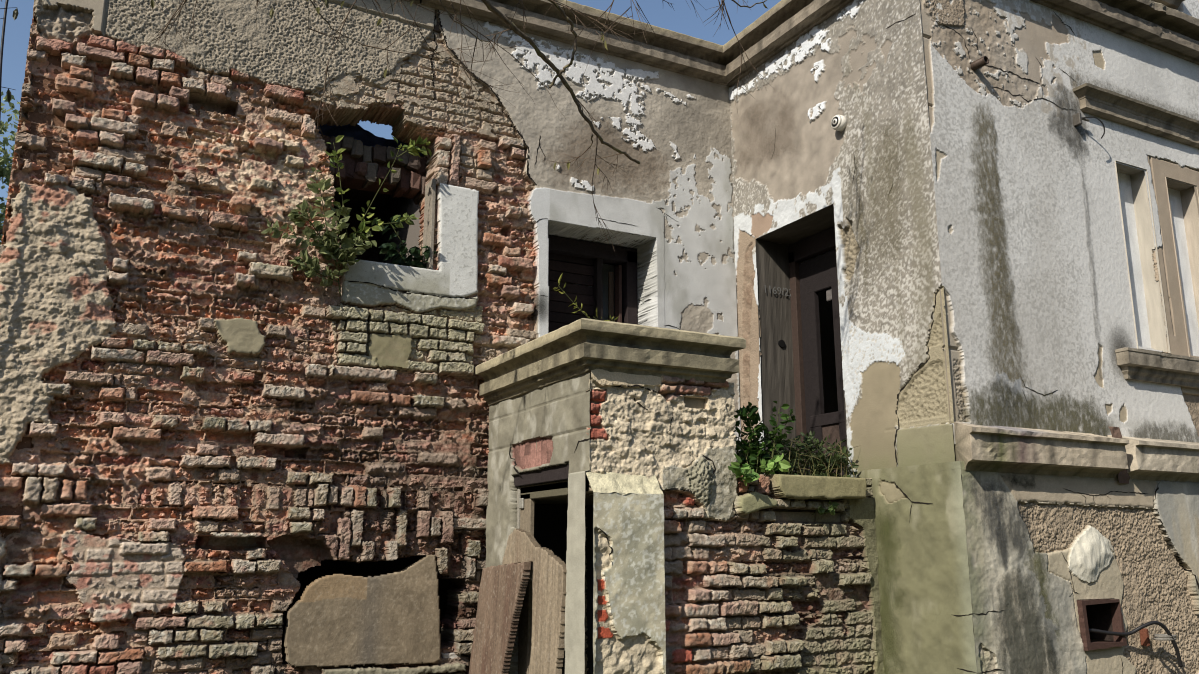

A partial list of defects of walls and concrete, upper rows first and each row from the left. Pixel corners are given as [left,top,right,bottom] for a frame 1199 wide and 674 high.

spalling [21,3,333,330]
spalling [477,177,535,358]
peeling [483,21,694,151]
peeling [586,0,861,488]
peeling [919,0,1069,133]
leakage [973,108,1026,388]
spalling [280,366,490,483]
crack [894,283,942,522]
spalling [0,422,179,655]
spalling [594,526,720,674]
leakage [974,482,1057,674]
spalling [1017,501,1199,674]